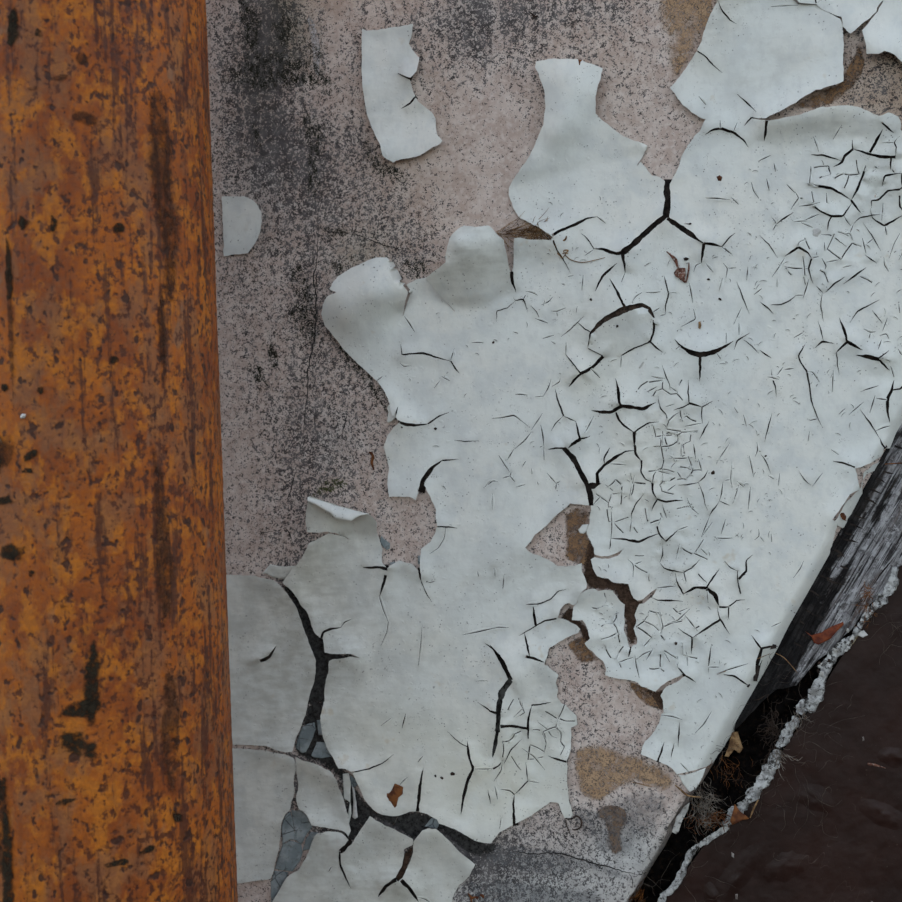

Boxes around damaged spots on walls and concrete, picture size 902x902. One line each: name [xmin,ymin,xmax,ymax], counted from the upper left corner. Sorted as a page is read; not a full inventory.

leakage [224,0,336,98]
leakage [300,111,329,208]
leakage [285,260,323,346]
leakage [251,341,279,391]
leakage [330,336,389,417]
peeling [221,0,902,902]
crack [395,94,902,772]
crack [363,565,391,646]
crack [447,589,643,888]
crack [416,756,424,811]
crack [328,838,352,889]
crack [378,877,432,902]